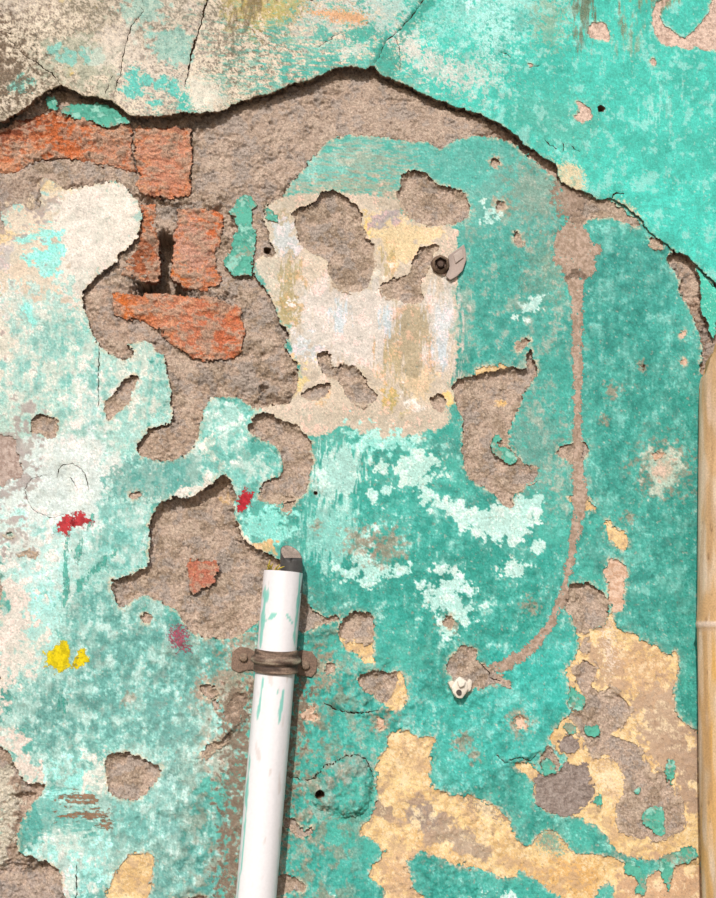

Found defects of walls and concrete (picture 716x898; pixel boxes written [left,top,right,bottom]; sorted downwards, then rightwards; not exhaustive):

crack [105,0,144,94]
crack [185,0,208,84]
peeling [652,0,716,51]
flaking render [0,67,640,516]
spalling [111,474,280,639]
spalling [298,593,408,711]
spalling [199,684,248,760]
peeling [360,520,702,898]
spalling [0,747,66,898]
spalling [105,751,162,801]
peeling [104,852,154,898]
spalling [277,874,305,898]